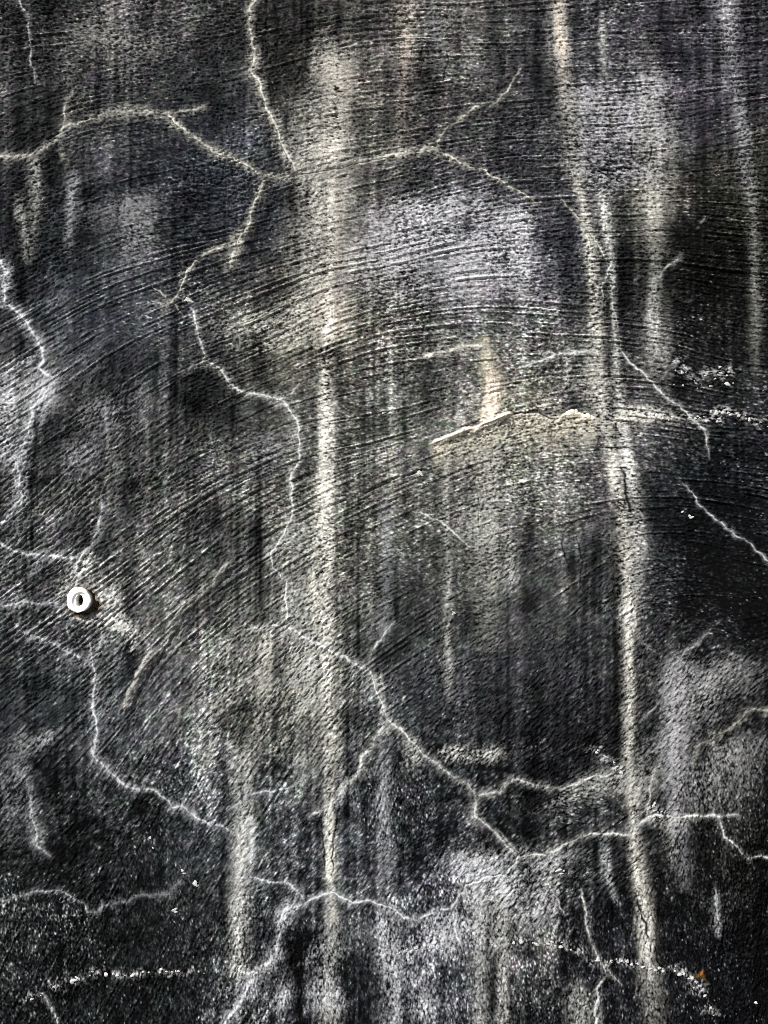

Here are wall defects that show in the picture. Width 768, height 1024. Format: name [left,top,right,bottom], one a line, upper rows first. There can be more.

crack [0,0,535,306]
water stain [363,200,538,297]
crack [564,203,615,311]
crack [0,259,103,577]
water stain [243,43,351,895]
water stain [480,336,502,423]
water stain [553,0,768,1016]
crack [23,775,40,849]
crack [24,631,301,831]
water stain [230,750,259,979]
crack [191,310,768,1024]
water stain [378,853,583,1024]